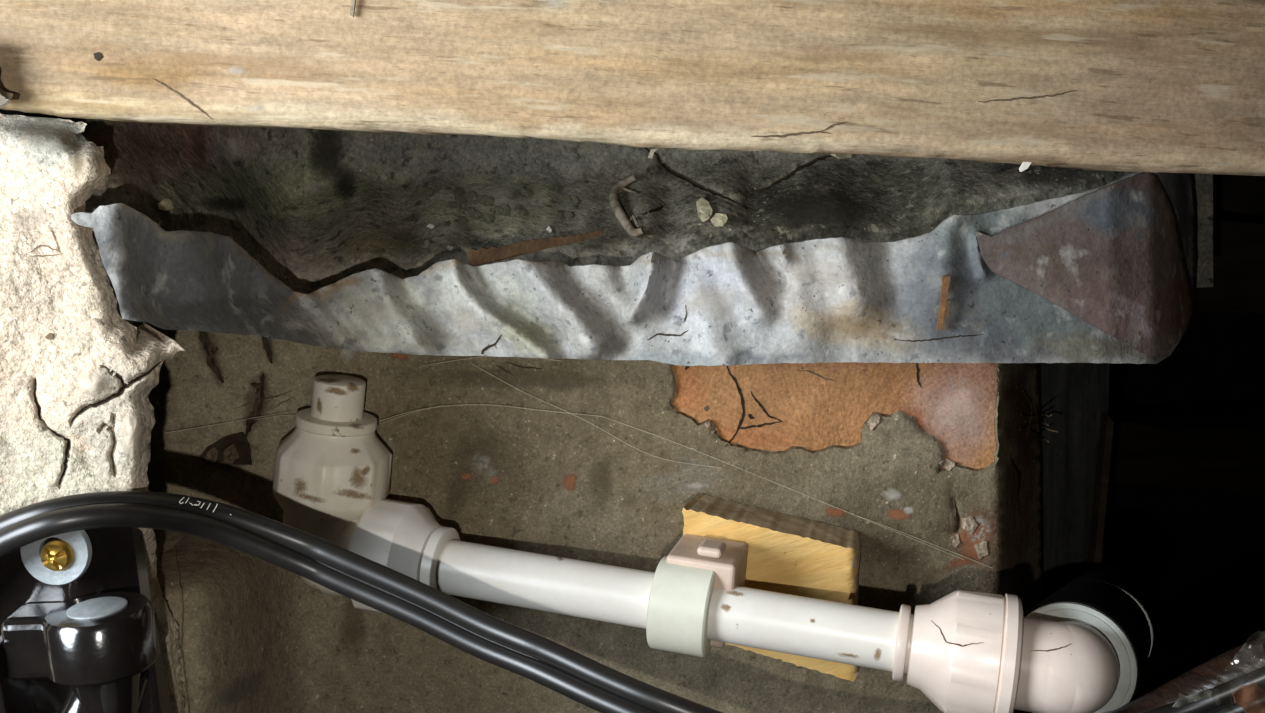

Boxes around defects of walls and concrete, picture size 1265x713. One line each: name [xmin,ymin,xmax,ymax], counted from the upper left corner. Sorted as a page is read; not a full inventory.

crack [33,361,162,484]
flaking render [671,362,998,471]